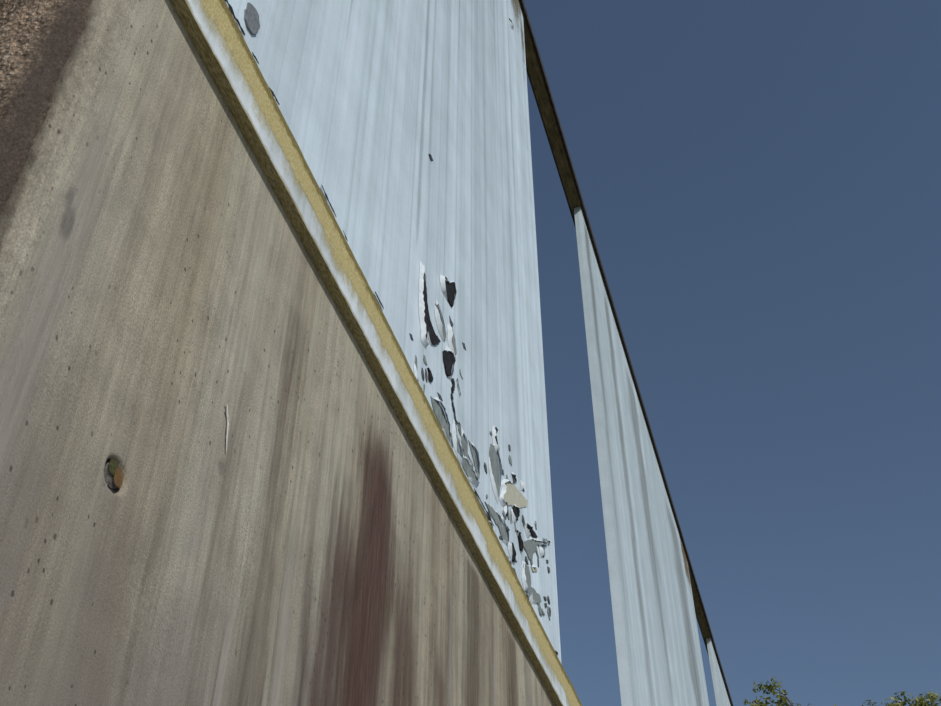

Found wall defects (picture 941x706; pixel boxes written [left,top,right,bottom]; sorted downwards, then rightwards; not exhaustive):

spalling [0,0,92,162]
peeling [244,2,260,35]
corrosion [170,0,564,706]
peeling [409,261,551,621]